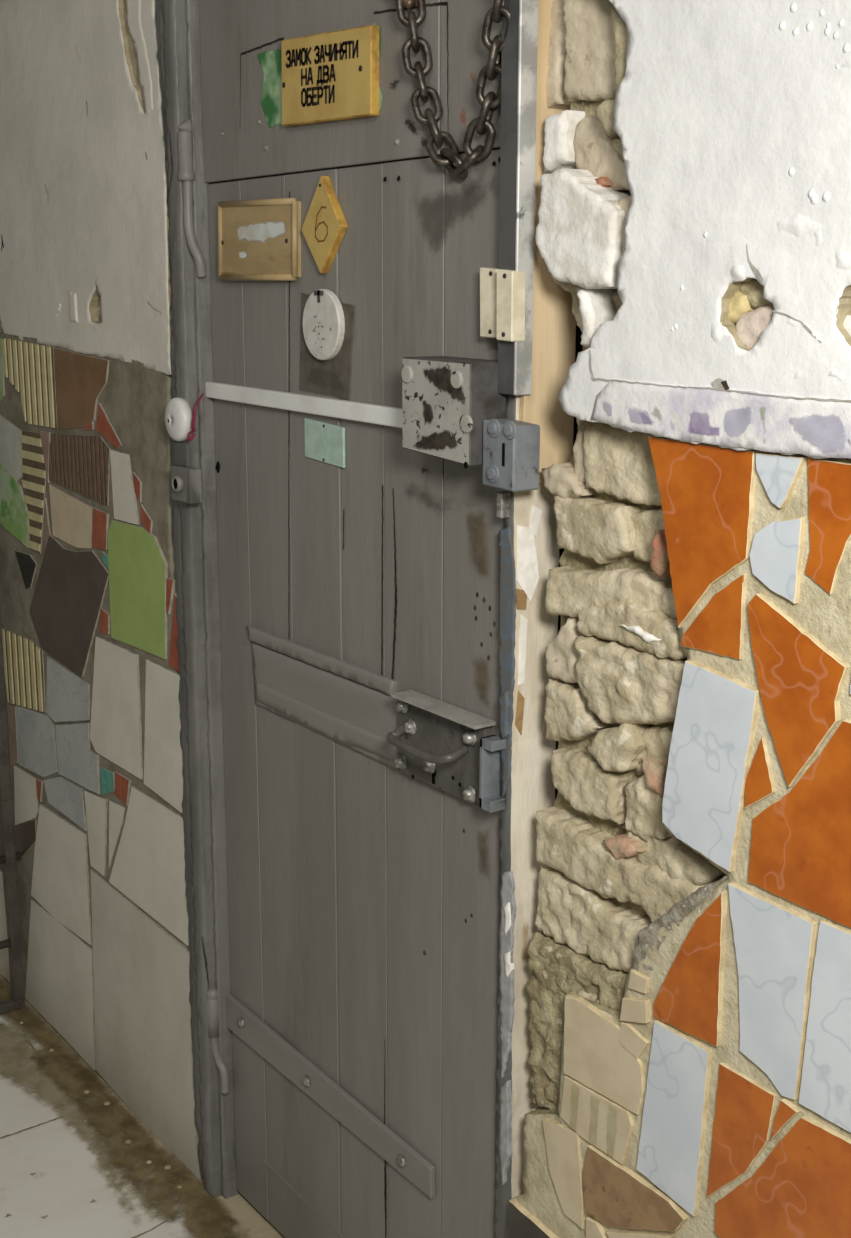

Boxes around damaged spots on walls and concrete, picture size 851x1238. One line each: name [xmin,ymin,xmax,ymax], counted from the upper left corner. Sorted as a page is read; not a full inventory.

flaking render [535,0,631,351]
flaking render [728,244,822,348]
flaking render [474,418,726,1186]
damp [33,1045,236,1238]